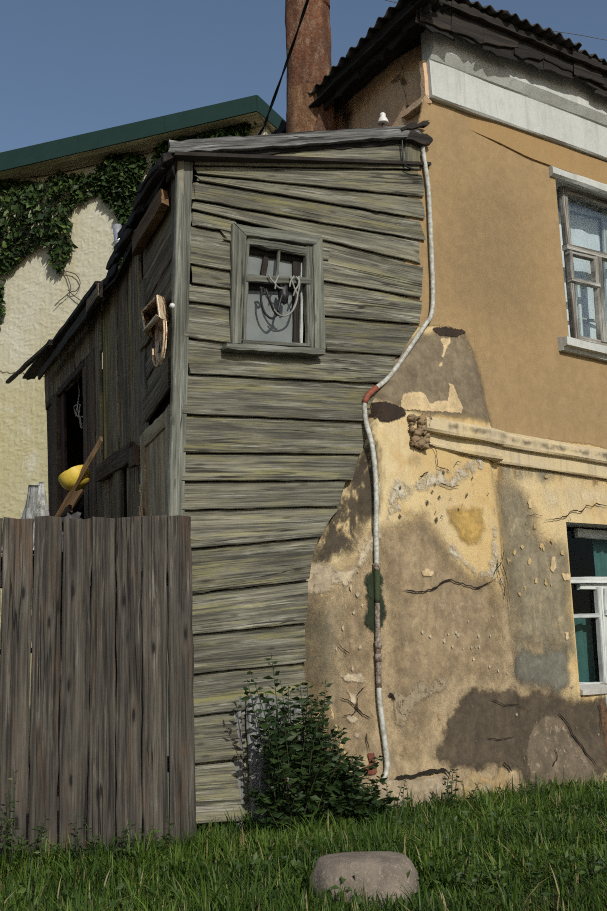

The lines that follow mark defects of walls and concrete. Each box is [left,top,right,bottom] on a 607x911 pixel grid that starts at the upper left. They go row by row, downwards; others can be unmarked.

peeling [439,337,451,367]
peeling [356,383,463,439]
crack [527,503,606,520]
crack [406,530,510,604]
leakage [295,442,607,802]